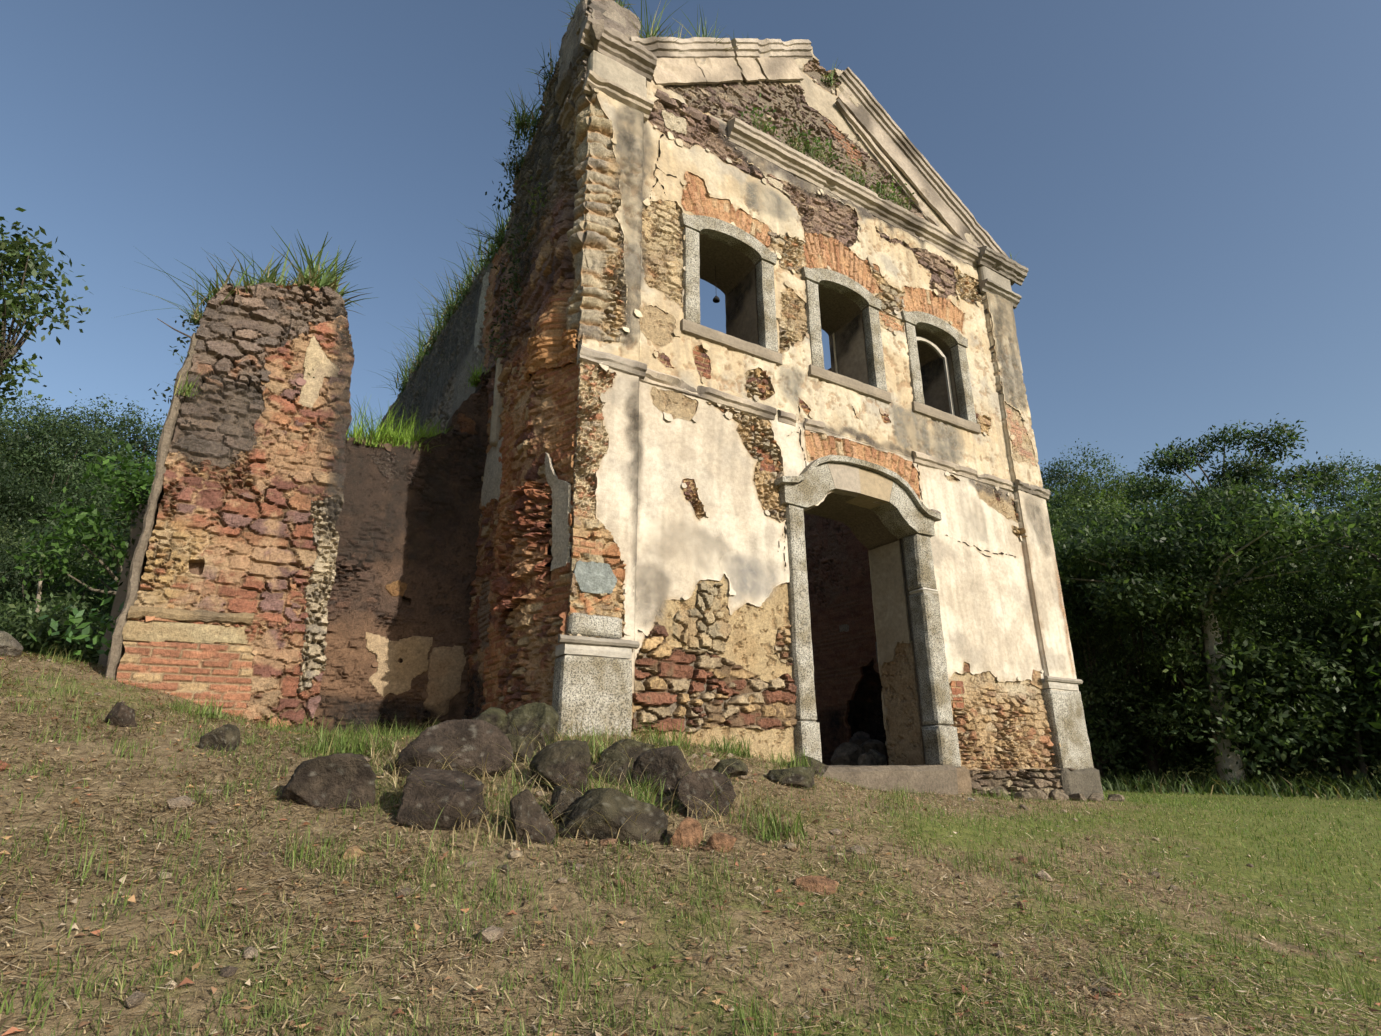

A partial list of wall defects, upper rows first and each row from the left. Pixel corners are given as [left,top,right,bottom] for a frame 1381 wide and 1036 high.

leakage [627,395,639,442]
flaking render [491,59,988,766]
flaking render [948,670,1061,771]